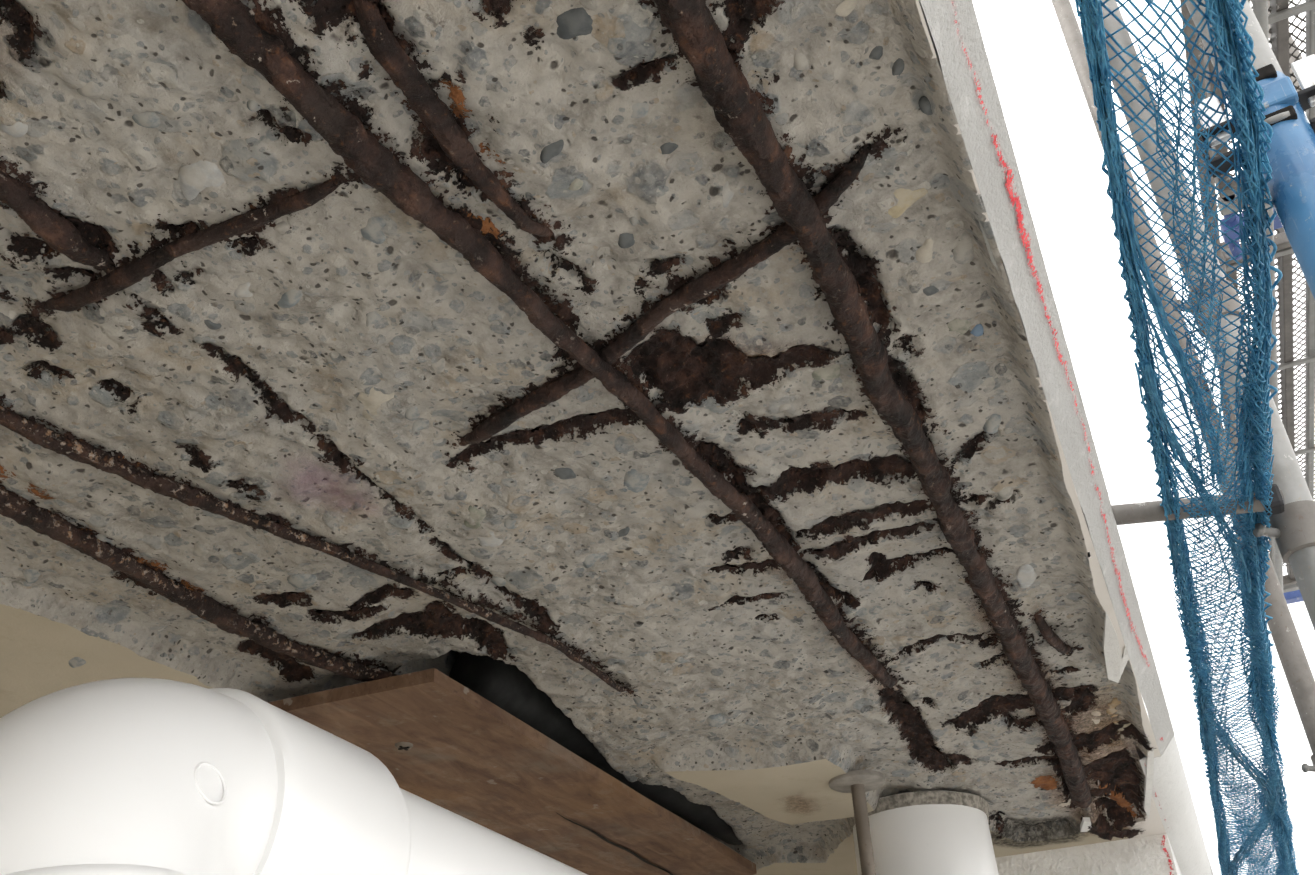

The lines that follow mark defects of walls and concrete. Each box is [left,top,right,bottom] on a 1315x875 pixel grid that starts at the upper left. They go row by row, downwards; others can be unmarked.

corrosion [0,0,47,71]
corrosion [0,143,309,384]
spalling [0,514,367,703]
spalling [179,161,224,201]
corrosion [0,343,646,697]
spalling [356,387,395,420]
spalling [240,0,785,349]
corrosion [247,0,783,353]
spalling [477,378,628,447]
spalling [616,240,912,493]
corrosion [611,0,1156,841]
spalling [735,0,1154,822]